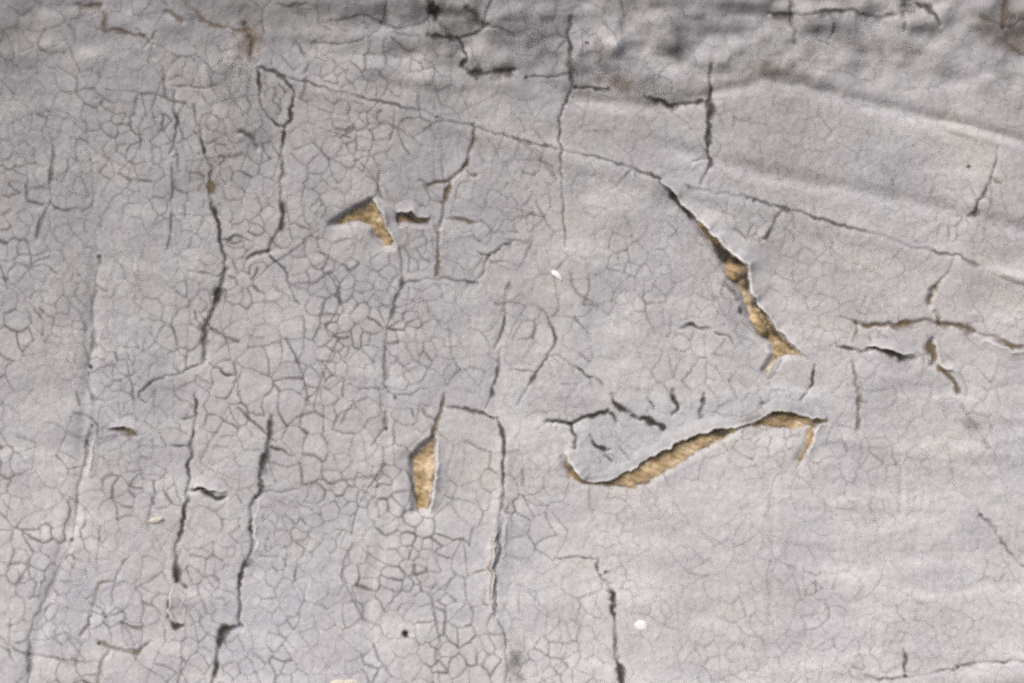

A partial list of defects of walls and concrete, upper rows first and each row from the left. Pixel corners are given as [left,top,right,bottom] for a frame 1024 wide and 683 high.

crack [820,9,848,35]
crack [916,3,938,20]
peeling [335,196,430,249]
crack [427,0,660,179]
crack [649,67,714,188]
crack [746,196,864,240]
crack [967,157,997,216]
crack [63,32,575,683]
peeling [547,177,828,489]
crack [840,294,1024,426]
peeling [412,436,450,513]
crack [581,557,625,683]